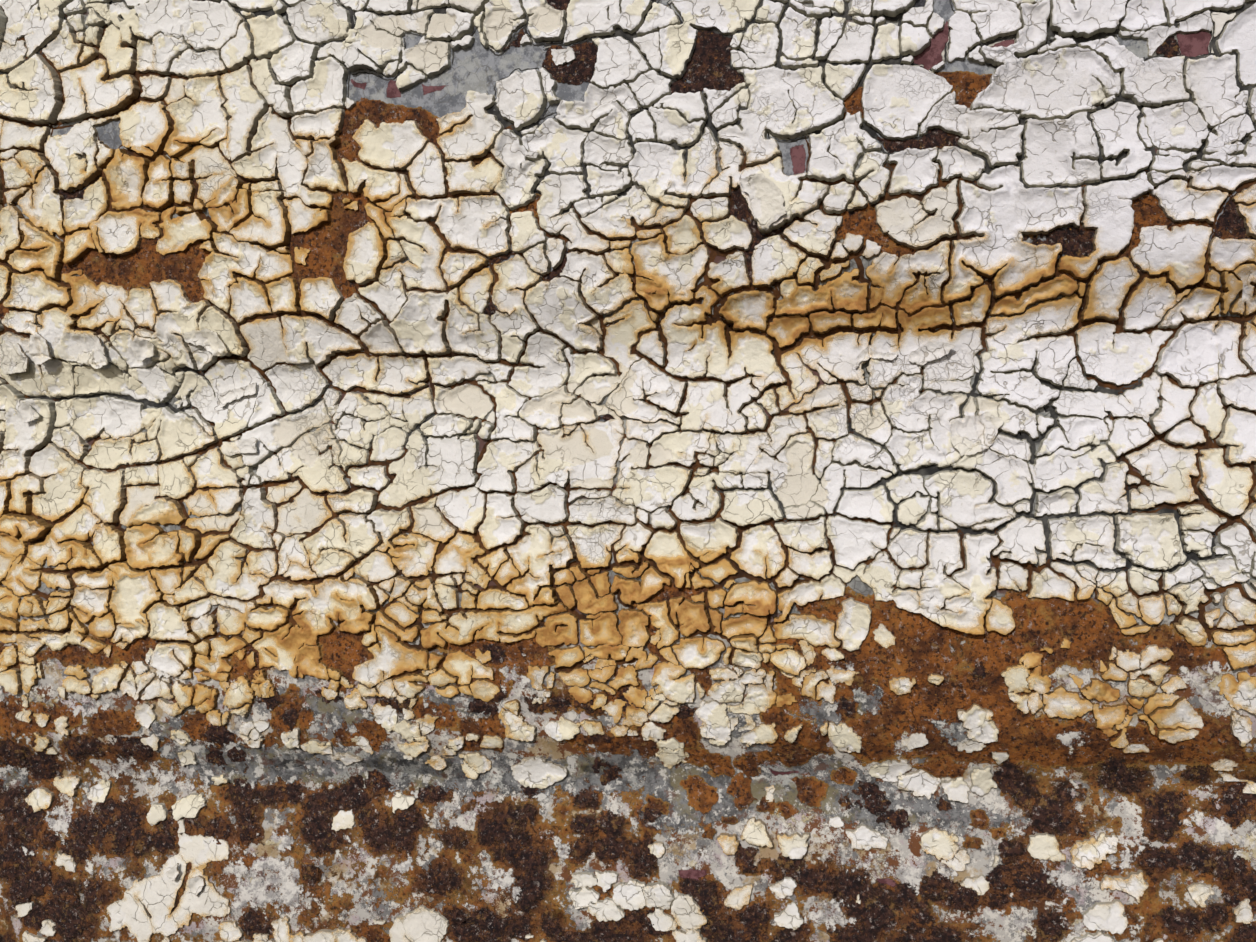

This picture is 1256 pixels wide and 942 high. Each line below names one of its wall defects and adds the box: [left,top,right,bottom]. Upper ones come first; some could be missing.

rust [0,51,471,353]
crack [0,0,1256,695]
peeling [0,0,1256,753]
rust [601,186,1256,368]
rust [0,461,1256,942]
peeling [610,667,706,769]
peeling [869,703,1009,803]
crack [147,867,191,918]
peeling [105,773,367,942]
peeling [373,905,449,942]
peeling [569,870,708,942]
peeling [1027,832,1149,942]